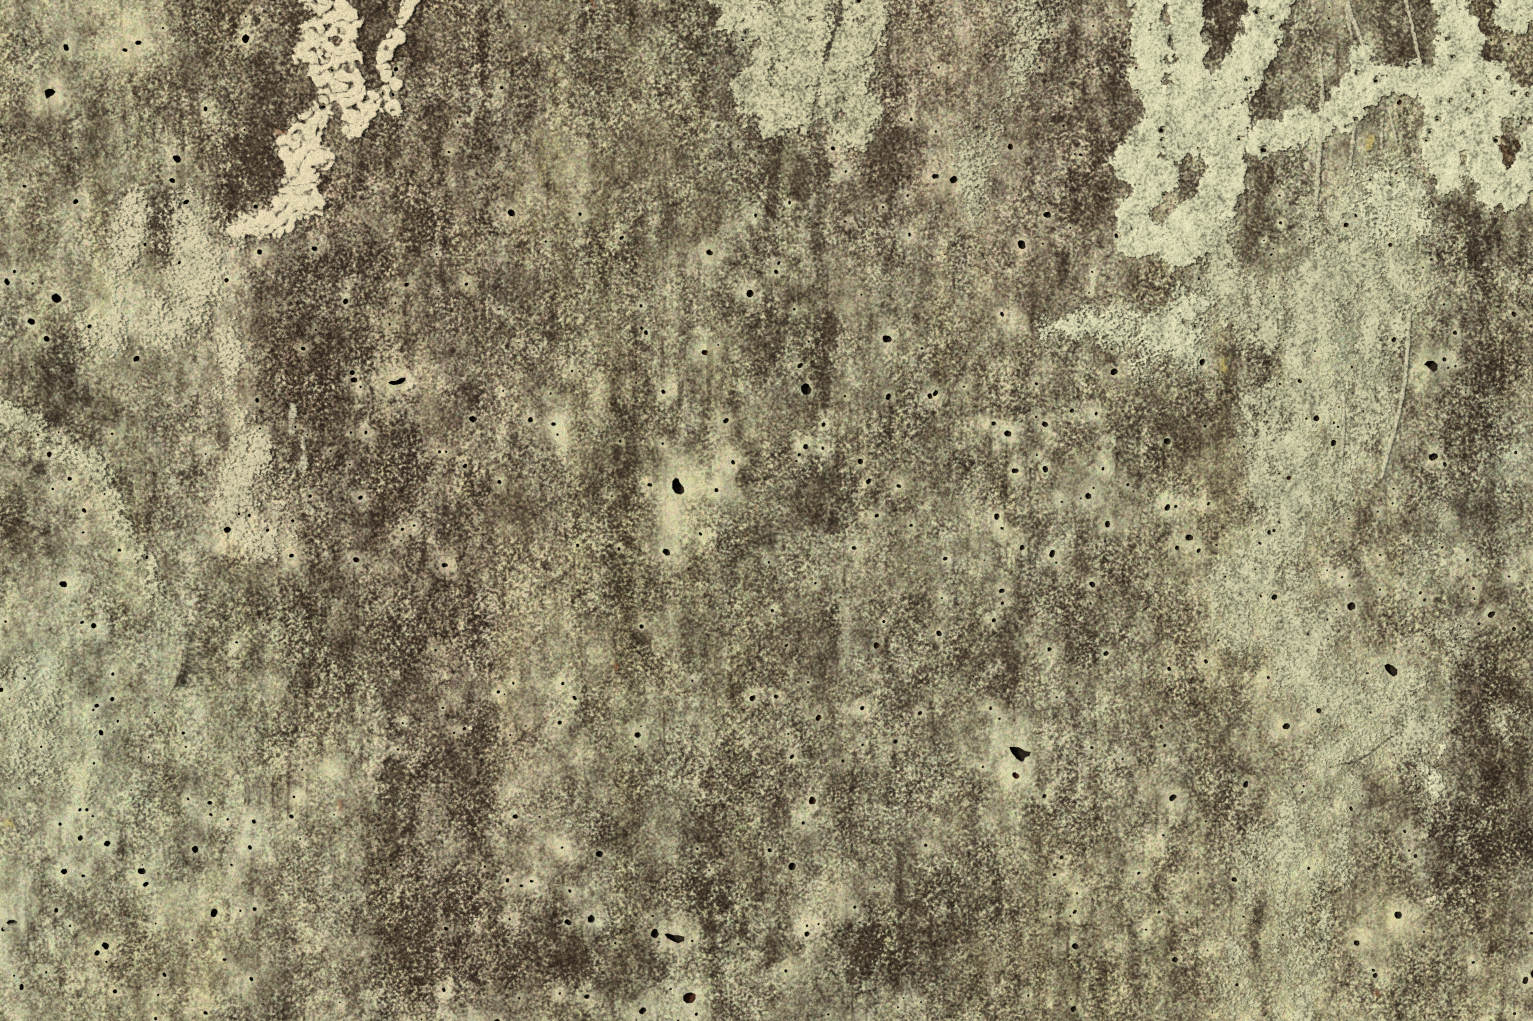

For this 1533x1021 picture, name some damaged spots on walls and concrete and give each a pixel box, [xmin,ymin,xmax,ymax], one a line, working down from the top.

leakage [708,0,895,293]
leakage [0,0,676,1021]
leakage [797,465,850,534]
leakage [820,311,838,408]
leakage [933,0,1533,1021]